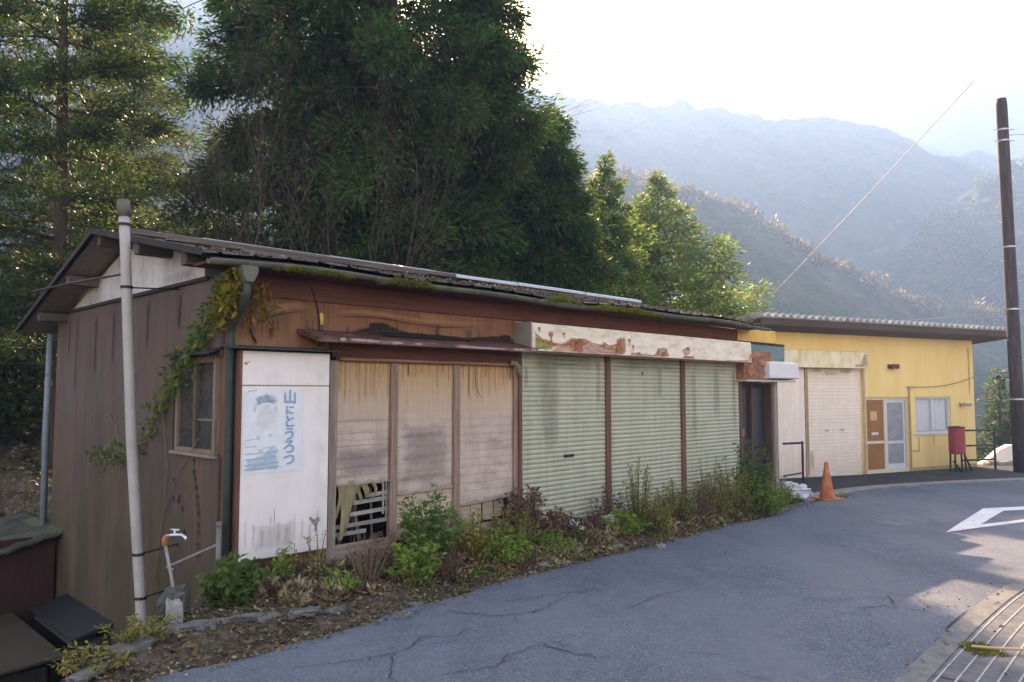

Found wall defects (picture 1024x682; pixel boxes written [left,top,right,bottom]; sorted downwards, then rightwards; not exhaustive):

crack [296,589,604,682]